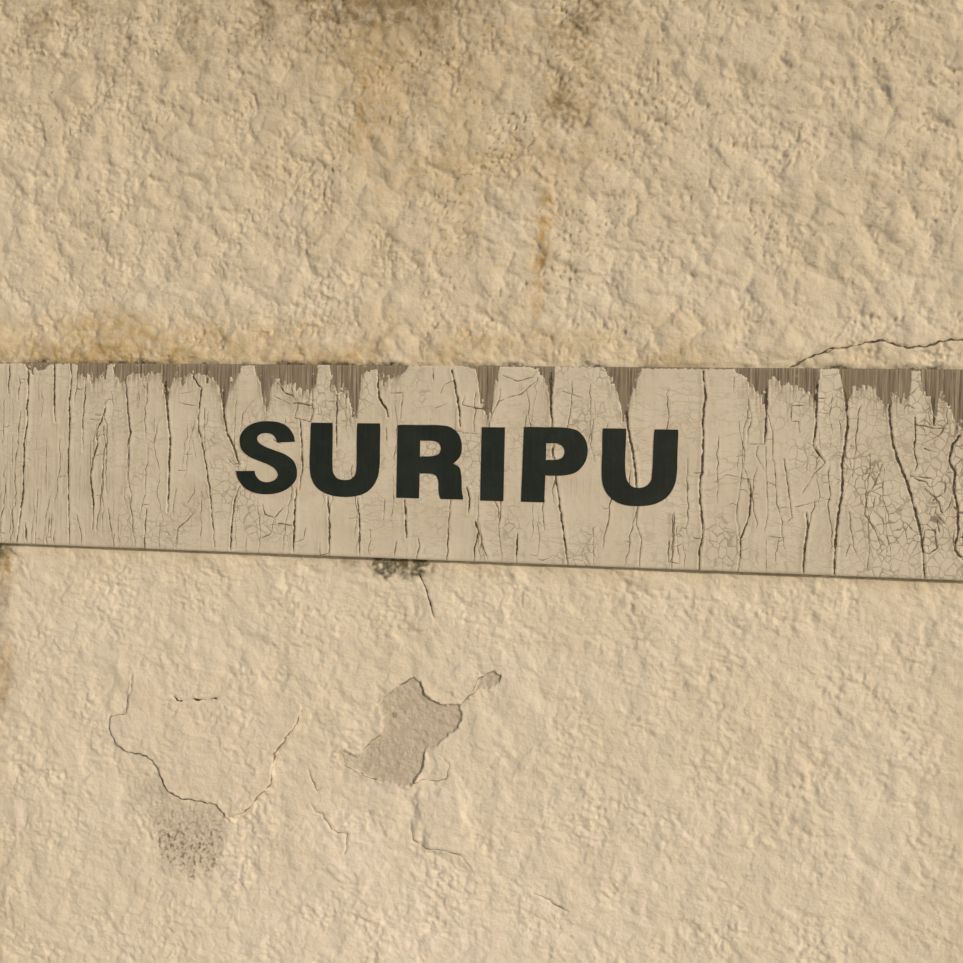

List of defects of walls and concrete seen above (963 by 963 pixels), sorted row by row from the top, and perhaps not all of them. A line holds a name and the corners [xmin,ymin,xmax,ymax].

damp [0,0,963,370]
crack [790,338,963,368]
flaking render [334,670,503,788]
damp [0,543,963,963]